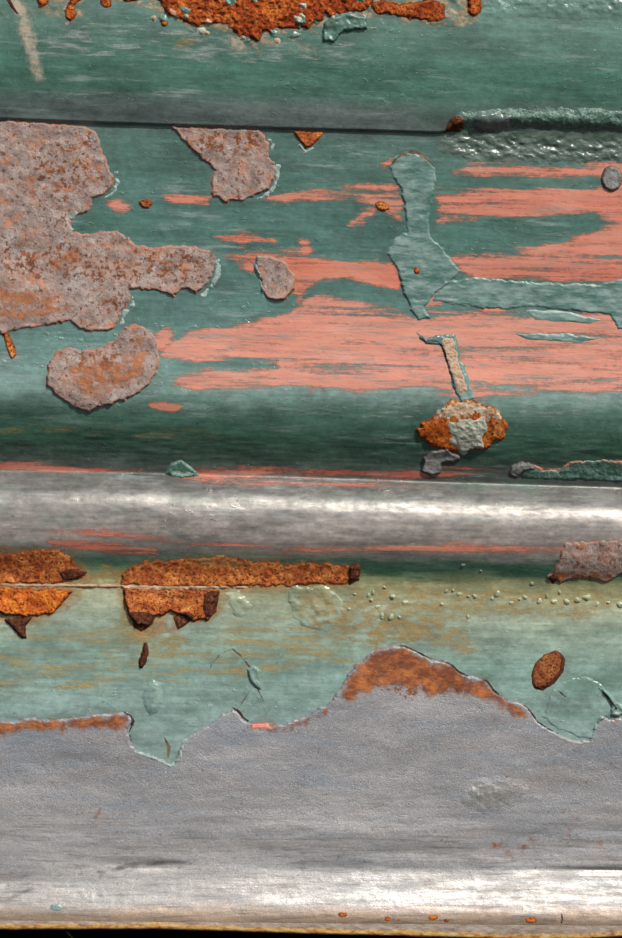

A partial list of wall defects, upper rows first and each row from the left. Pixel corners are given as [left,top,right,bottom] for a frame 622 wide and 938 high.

corrosion [36,0,84,24]
corrosion [100,0,482,50]
peeling [105,200,131,213]
peeling [153,151,622,402]
peeling [148,401,183,412]
corrosion [416,399,509,455]
corrosion [0,548,622,737]
peeling [0,645,622,926]